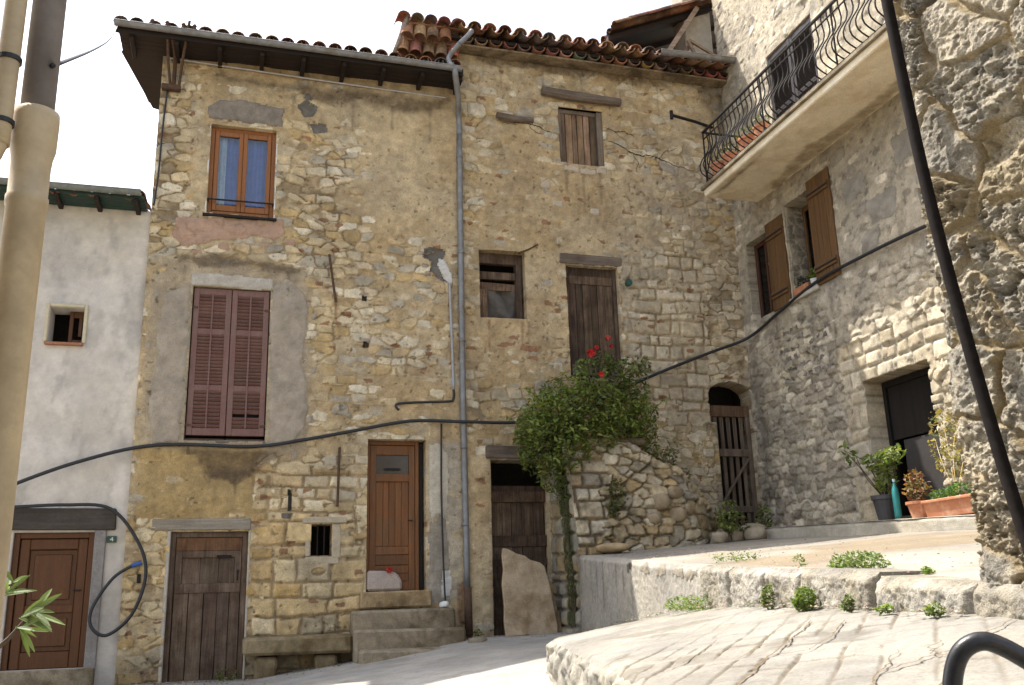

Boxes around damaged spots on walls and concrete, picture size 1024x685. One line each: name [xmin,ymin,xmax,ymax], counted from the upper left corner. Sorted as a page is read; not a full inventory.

crack [604,127,691,175]
damp [188,450,276,484]
crack [736,620,845,685]
crack [872,640,949,685]